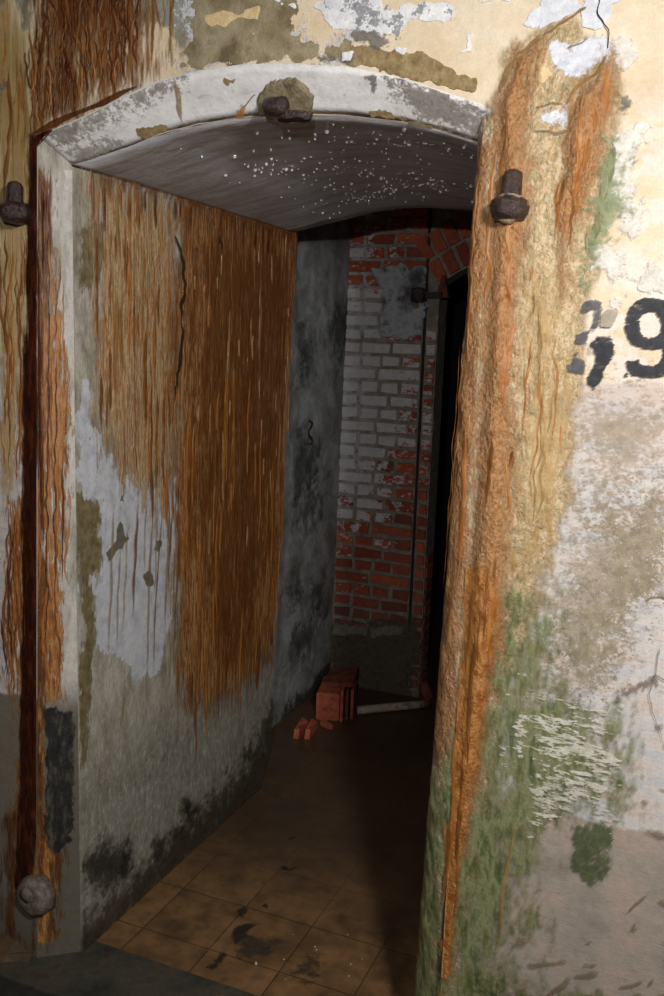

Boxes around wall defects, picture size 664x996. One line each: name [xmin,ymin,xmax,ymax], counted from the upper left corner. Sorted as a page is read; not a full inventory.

flaking render [136,124,167,139]
peeling [134,0,478,92]
crack [499,0,609,135]
peeling [610,35,639,71]
damp [79,221,106,288]
damp [329,304,348,362]
peeling [75,378,178,685]
corrosion [0,0,297,949]
corrosion [433,36,620,996]
damp [43,492,103,852]
crack [649,650,664,741]
damp [82,572,426,958]